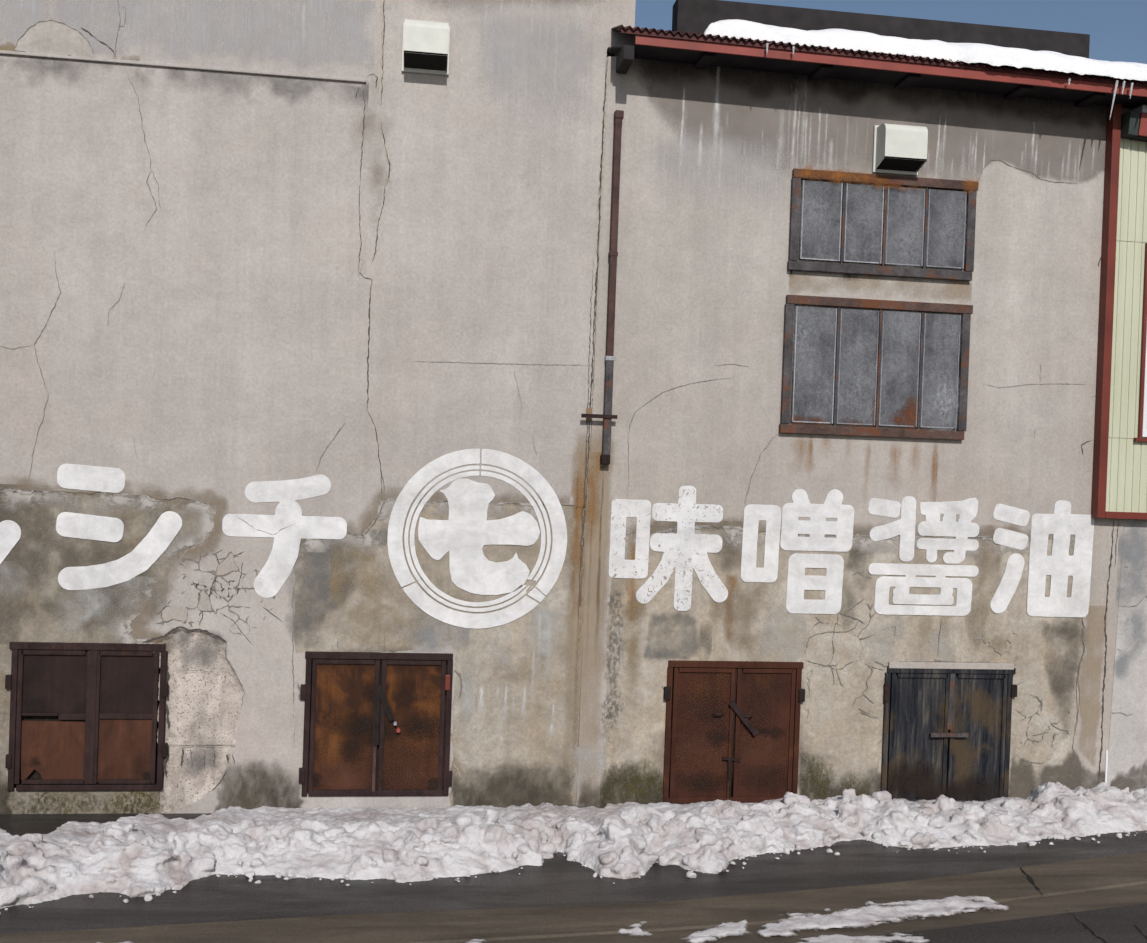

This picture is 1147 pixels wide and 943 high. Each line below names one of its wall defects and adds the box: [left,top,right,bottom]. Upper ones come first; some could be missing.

crack [115,2,160,225]
damp [639,59,1107,181]
crack [0,250,61,492]
crack [347,0,390,536]
flaking render [0,489,245,814]
crack [143,516,295,747]
rust [569,442,611,690]
crack [805,519,1147,784]
damp [1046,605,1105,697]
damp [1008,753,1147,799]